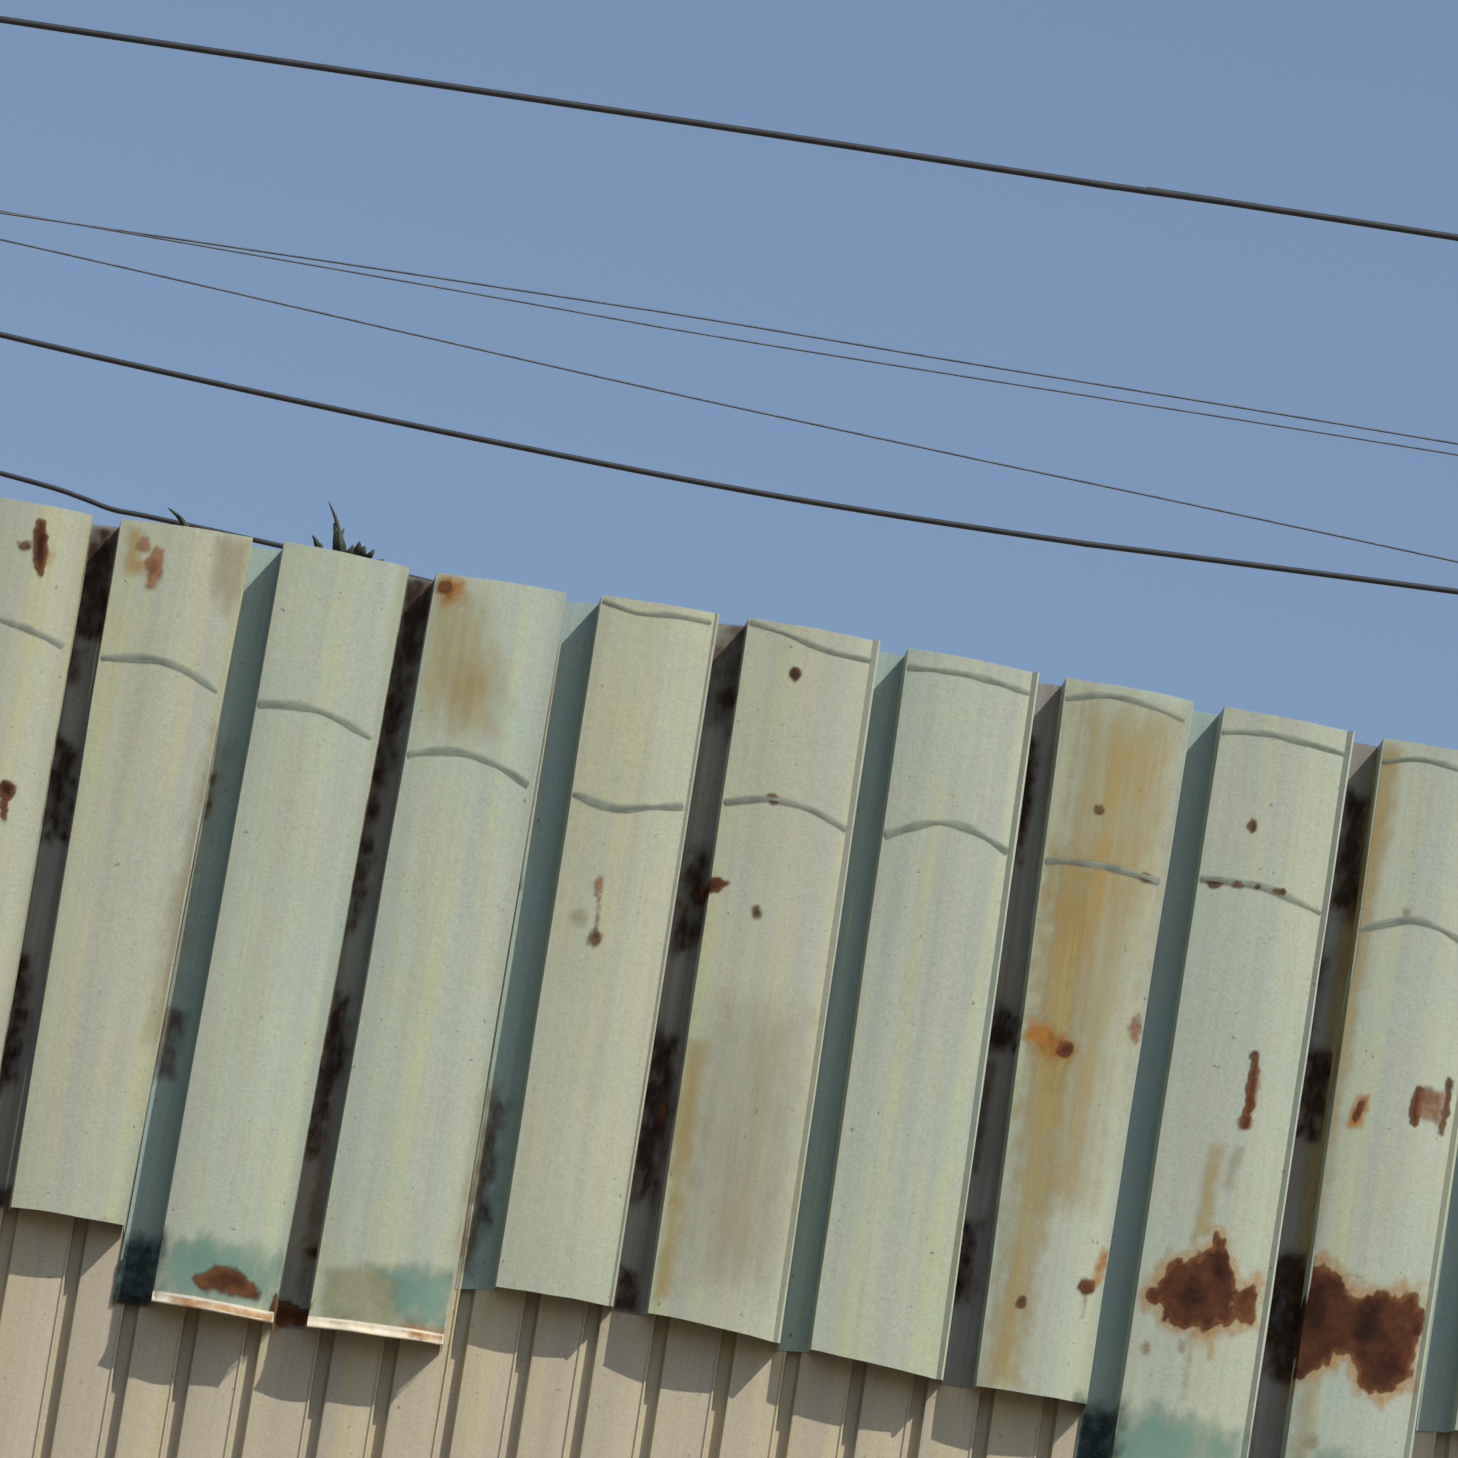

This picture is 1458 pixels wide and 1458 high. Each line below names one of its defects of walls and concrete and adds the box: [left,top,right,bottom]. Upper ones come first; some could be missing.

corrosion [19,518,49,576]
corrosion [70,529,113,677]
corrosion [350,578,463,929]
corrosion [0,780,16,820]
corrosion [1017,737,1036,846]
corrosion [1239,1050,1260,1128]
corrosion [1410,1077,1454,1135]
damp [164,1239,283,1299]
corrosion [181,1266,311,1329]
damp [326,1268,452,1328]
corrosion [1145,1165,1425,1402]
damp [1111,1407,1234,1458]